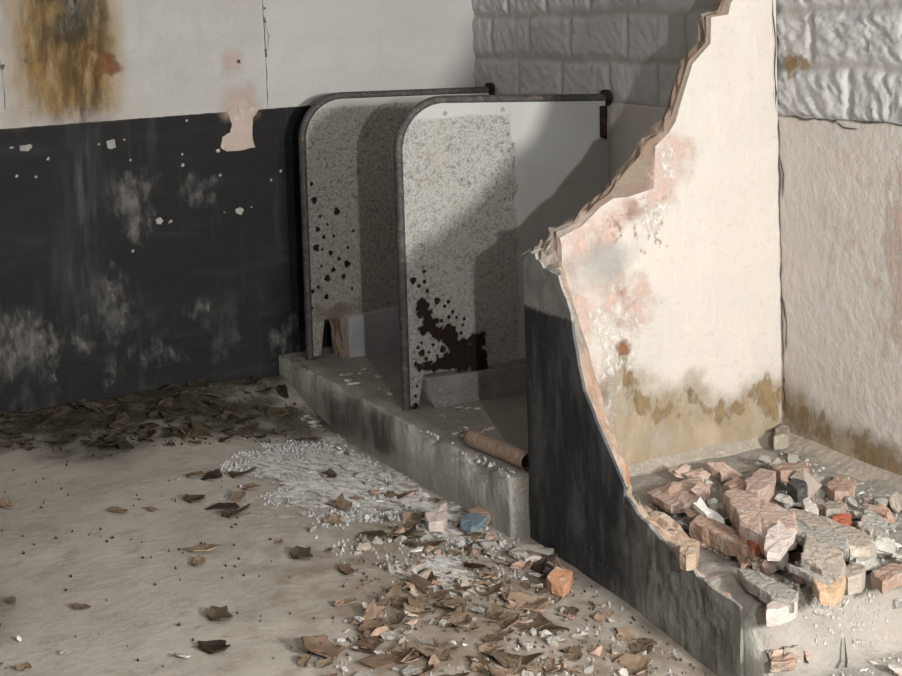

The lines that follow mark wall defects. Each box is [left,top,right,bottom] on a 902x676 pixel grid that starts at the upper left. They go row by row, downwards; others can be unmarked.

corrosion [19,0,120,115]
peeling [216,89,259,153]
corrosion [67,133,93,308]
peeling [568,140,694,269]
damp [0,311,59,379]
corrosion [410,269,489,373]
peeling [571,272,646,391]
damp [600,362,902,475]